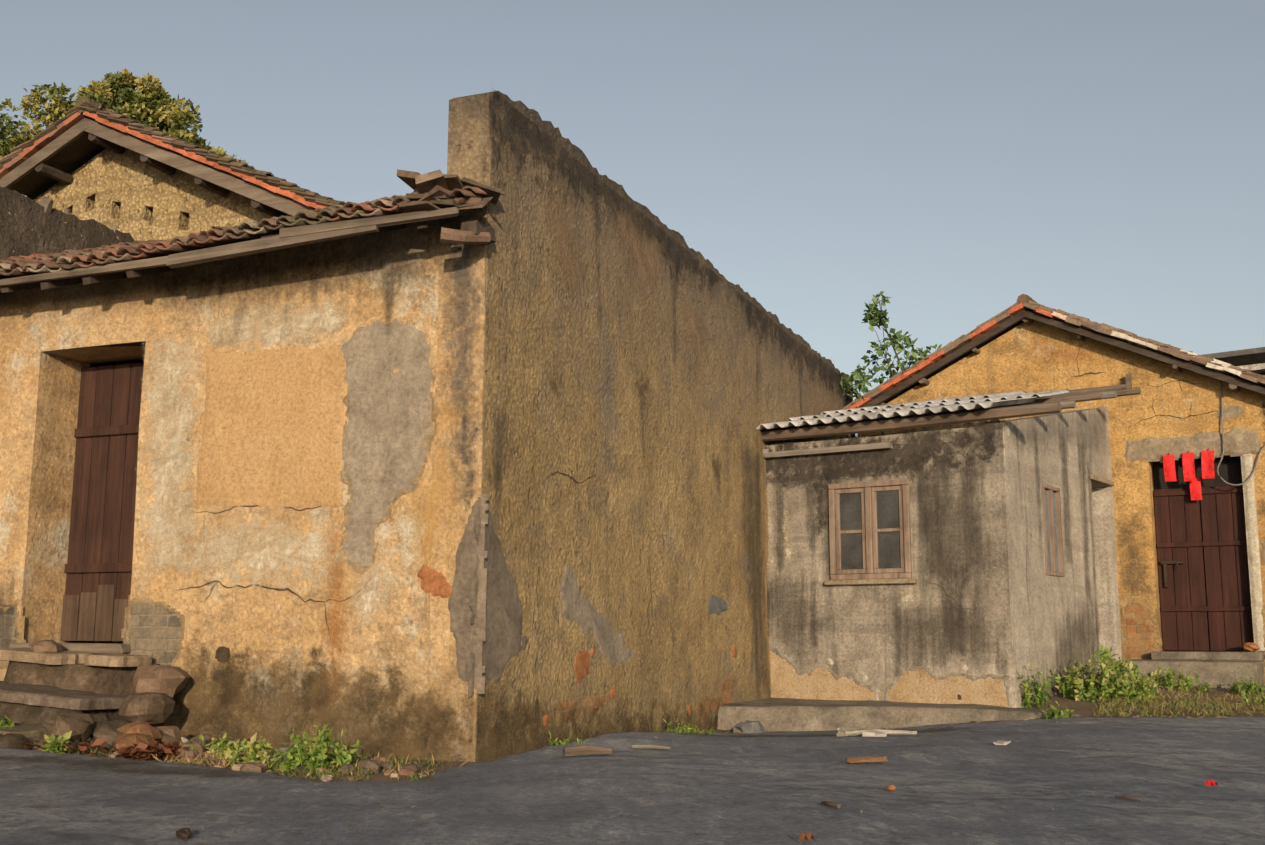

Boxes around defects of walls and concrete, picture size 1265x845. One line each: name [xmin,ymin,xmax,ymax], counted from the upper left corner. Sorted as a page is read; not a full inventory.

crack [180,580,368,639]
peeling [352,554,400,621]
spalling [417,564,452,598]
water stain [744,412,1105,693]
water stain [170,647,835,762]
flaking render [769,646,1017,708]